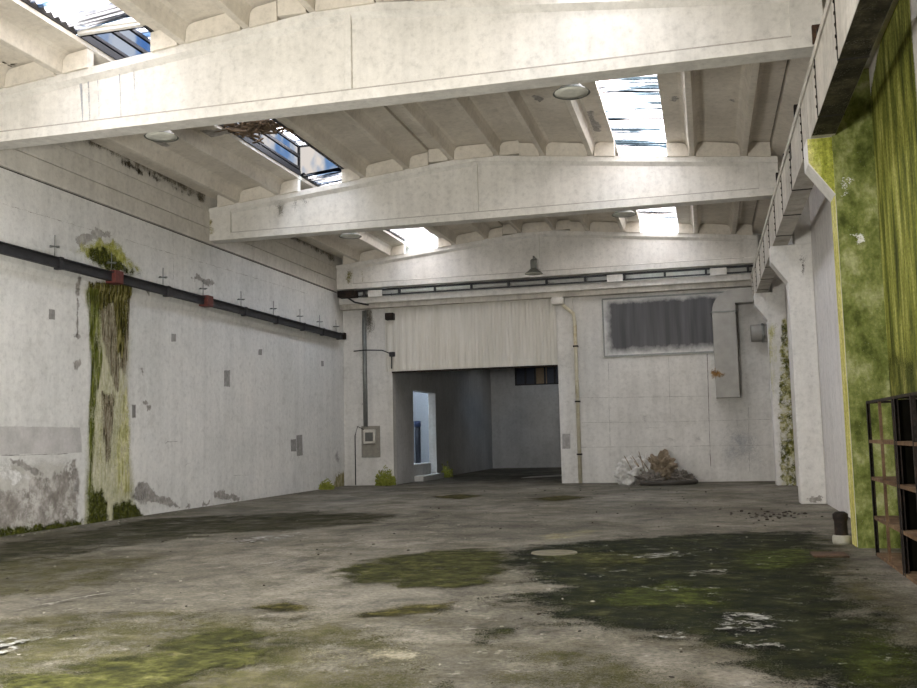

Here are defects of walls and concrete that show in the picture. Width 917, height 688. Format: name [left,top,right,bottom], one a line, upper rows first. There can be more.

water stain [0,284,397,600]
peeling [0,458,80,536]
spalling [131,481,190,509]
spalling [202,489,240,507]